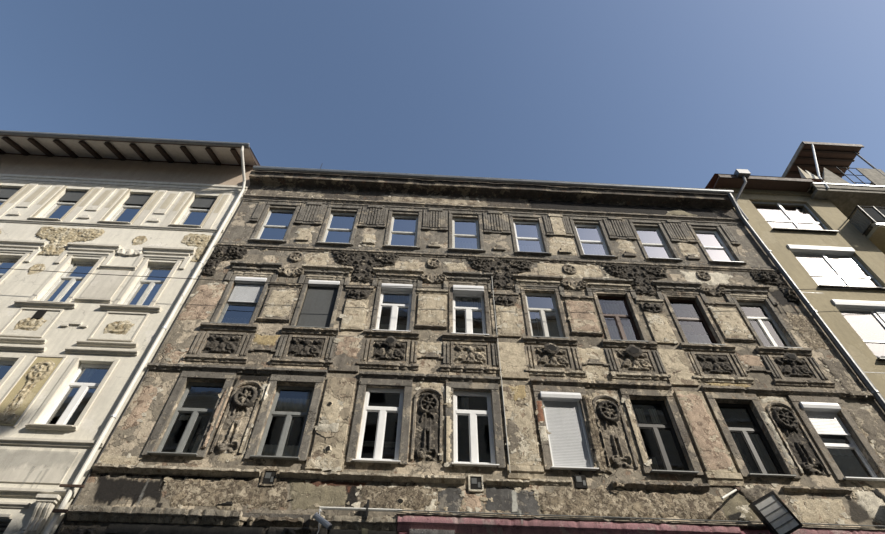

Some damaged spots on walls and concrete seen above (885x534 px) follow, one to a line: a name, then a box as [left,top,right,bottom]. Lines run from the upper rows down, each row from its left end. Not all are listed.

flaking render [577,347,616,381]
flaking render [786,311,885,464]
flaking render [97,453,144,466]
flaking render [200,386,233,449]
flaking render [217,423,254,463]
flaking render [305,445,344,471]
flaking render [314,398,344,433]
flaking render [505,389,551,465]
flaking render [512,379,758,522]
flaking render [164,476,442,513]
flaking render [444,490,504,513]